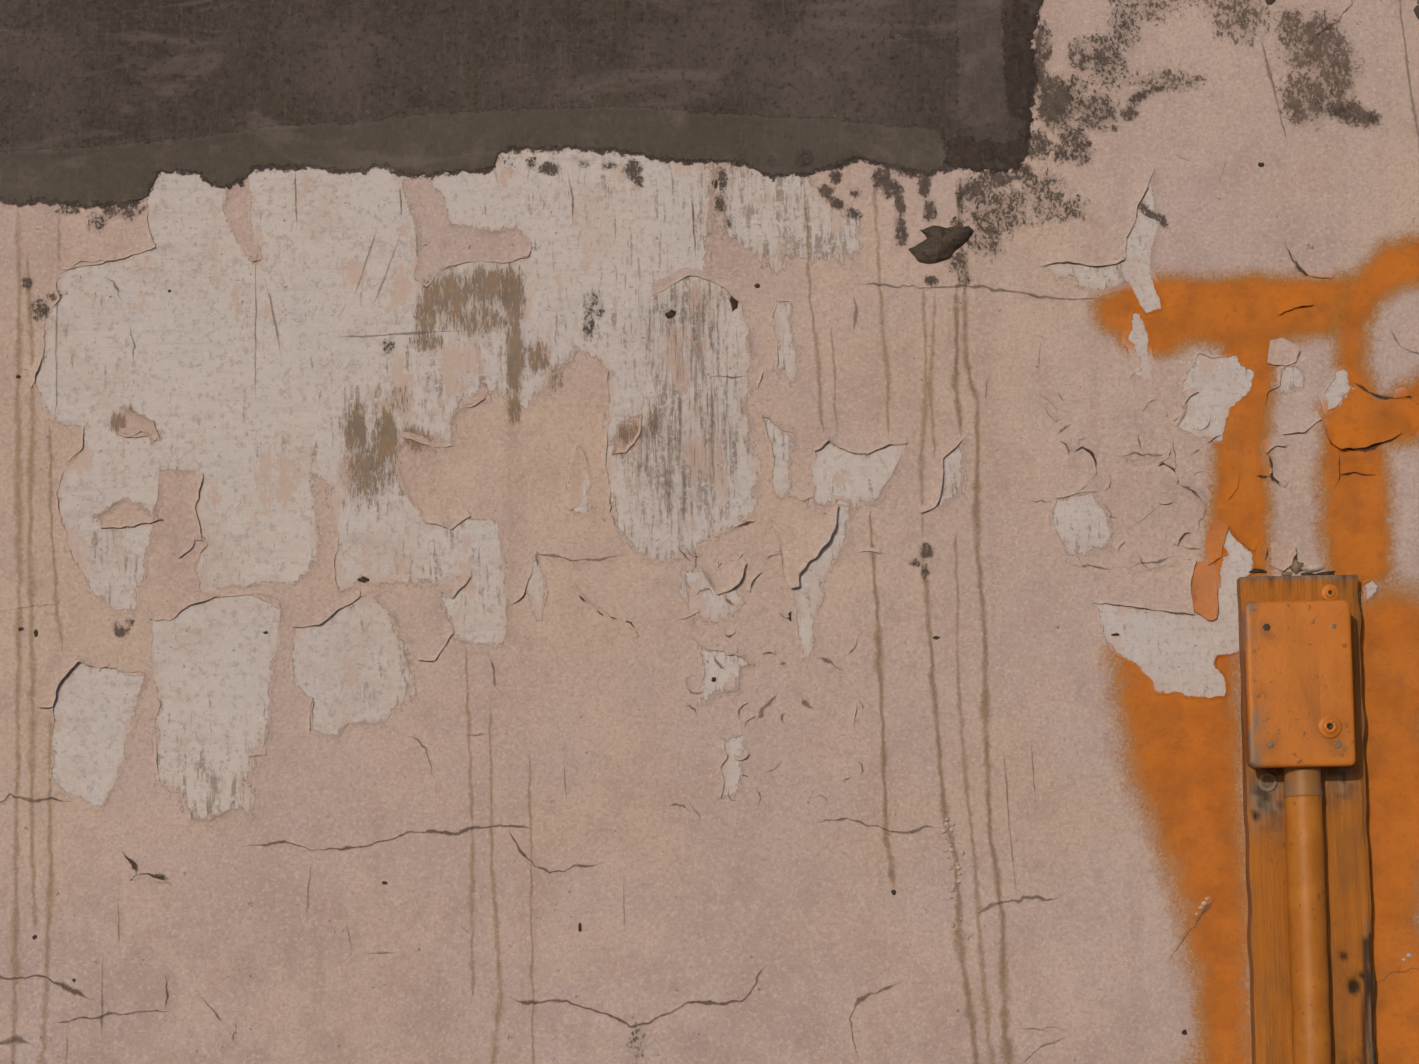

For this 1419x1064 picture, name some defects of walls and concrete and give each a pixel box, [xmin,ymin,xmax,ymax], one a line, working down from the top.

peeling [1036,164,1167,386]
peeling [1169,350,1257,444]
peeling [1277,363,1360,415]
peeling [16,147,970,826]
peeling [1043,477,1119,558]
peeling [1091,519,1262,702]
crack [0,793,64,808]
crack [262,825,593,873]
crack [0,975,168,1023]
crack [516,971,761,1027]
crack [0,1036,25,1044]